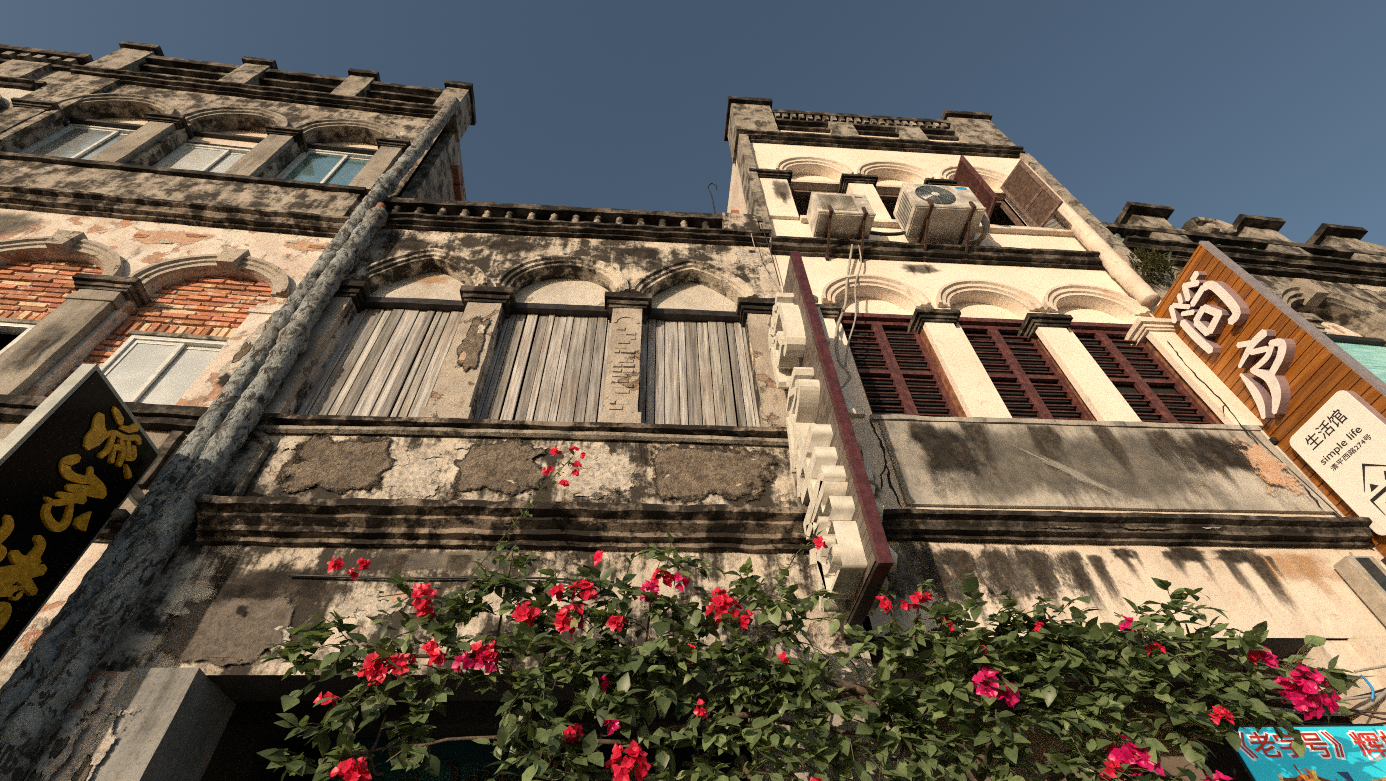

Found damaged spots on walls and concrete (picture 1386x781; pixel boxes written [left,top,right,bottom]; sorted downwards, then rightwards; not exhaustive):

water stain [380,236,432,257]
water stain [485,239,536,255]
water stain [610,247,660,264]
spalling [274,433,548,498]
spalling [568,443,777,503]
water stain [905,422,1260,500]
peeling [1227,437,1311,499]
water stain [885,541,1138,609]
water stain [1162,546,1288,601]
peeling [0,616,54,689]
peeling [24,647,137,781]